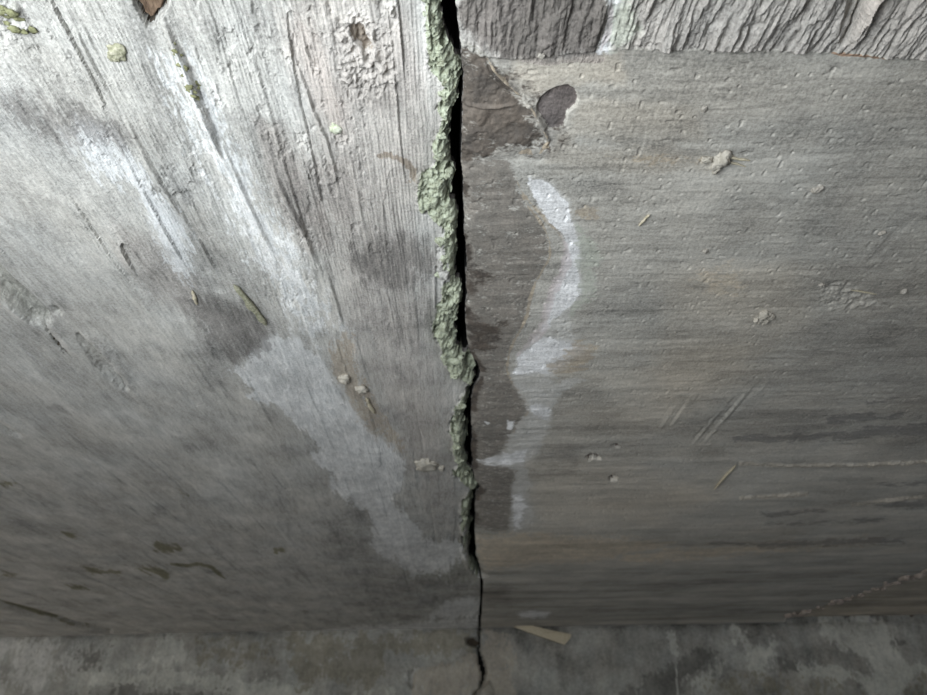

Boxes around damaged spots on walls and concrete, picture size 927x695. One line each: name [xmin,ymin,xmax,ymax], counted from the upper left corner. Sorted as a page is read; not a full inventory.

damp [0,0,646,585]
crack [441,0,485,695]